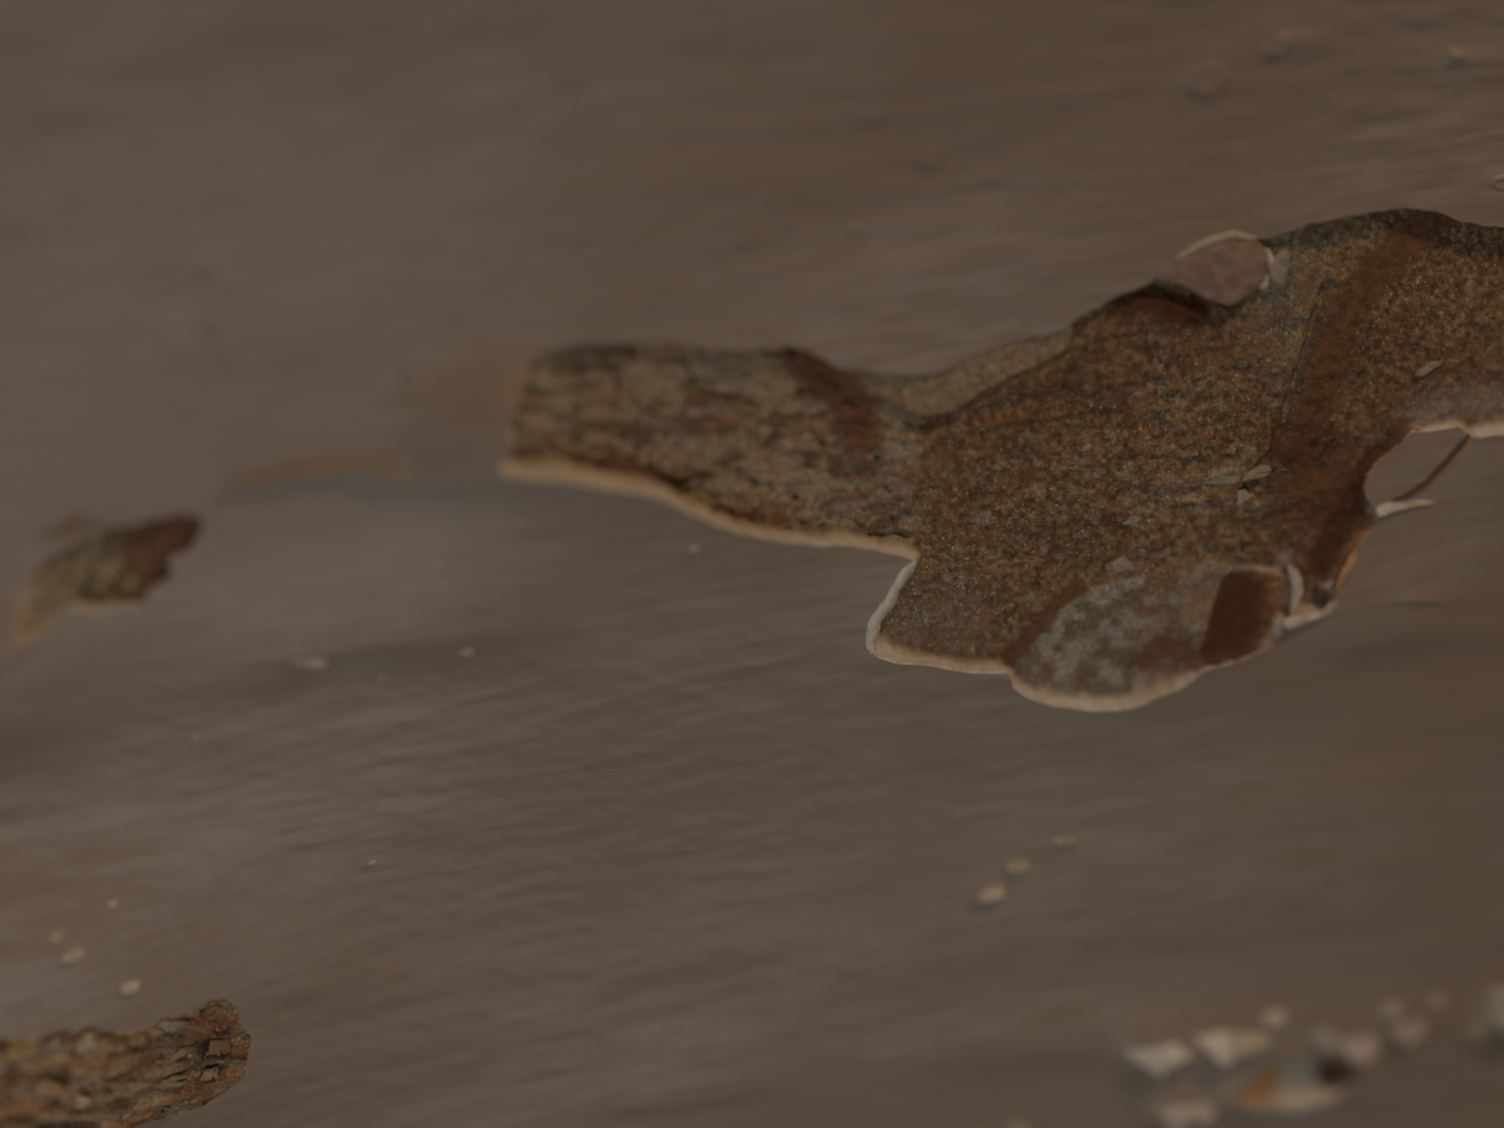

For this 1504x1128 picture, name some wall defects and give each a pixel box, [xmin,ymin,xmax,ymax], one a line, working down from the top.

spalling [499,208,1504,711]
spalling [12,517,203,646]
peeling [0,998,251,1128]
peeling [1156,1102,1216,1128]
peeling [1126,992,1449,1114]